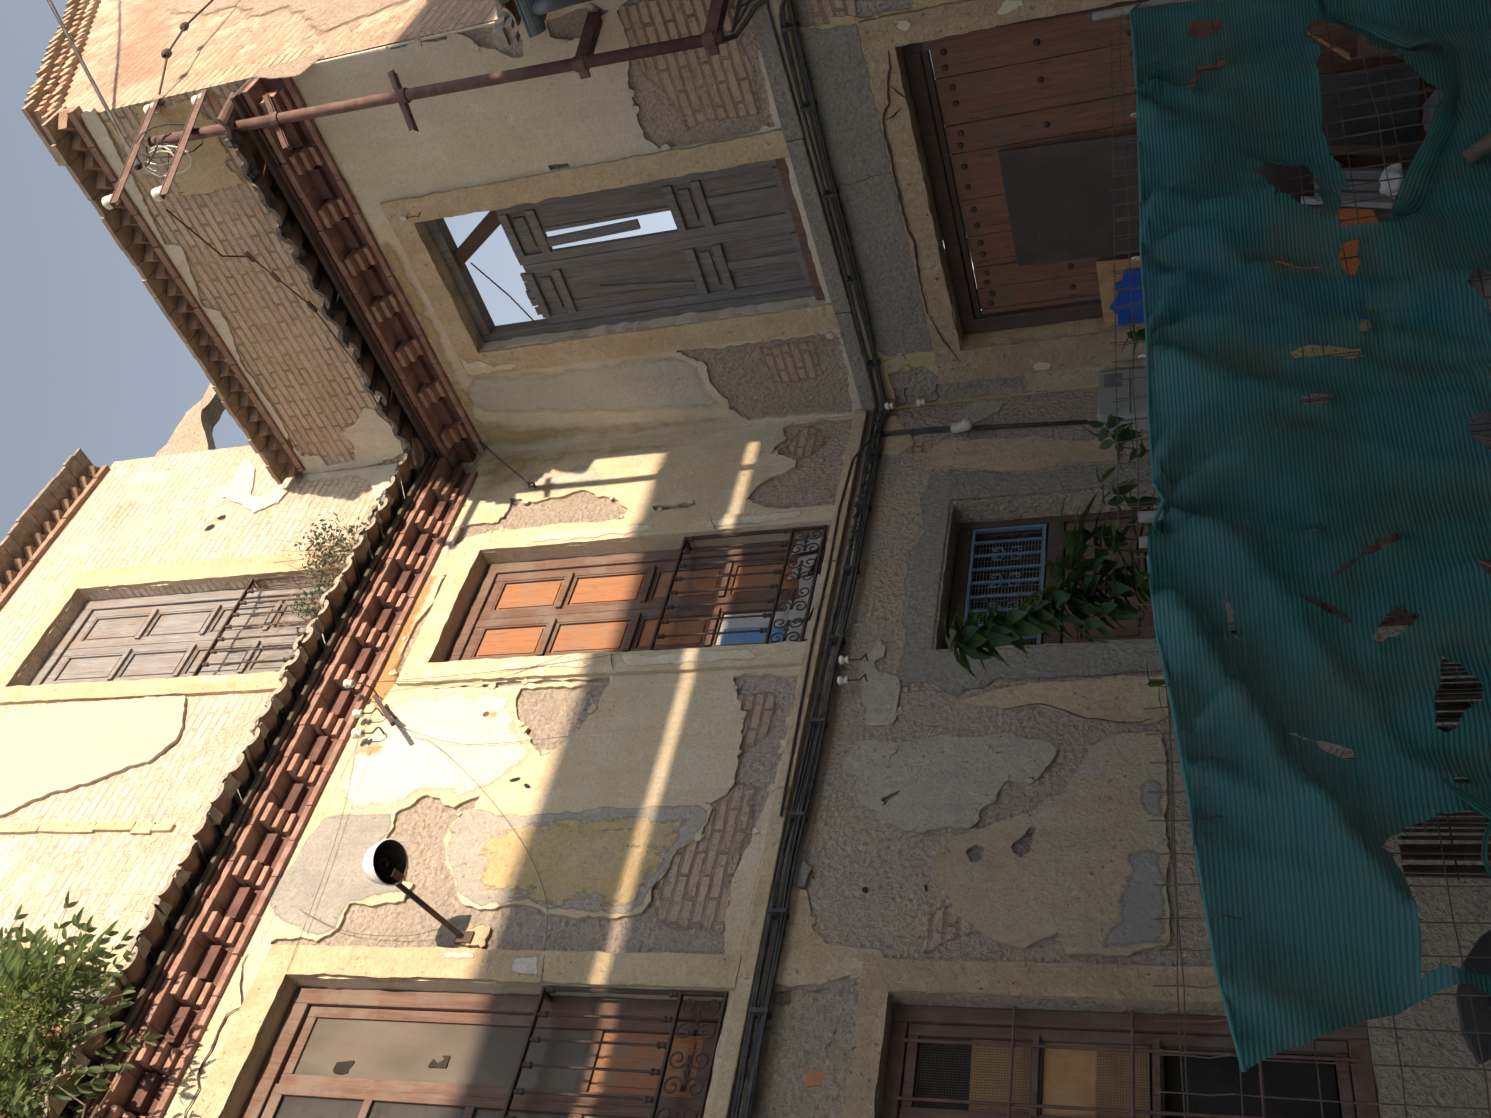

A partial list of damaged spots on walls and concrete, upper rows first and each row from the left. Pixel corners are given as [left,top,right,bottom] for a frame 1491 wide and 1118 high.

flaking render [385,27,524,57]
flaking render [548,0,775,151]
crack [843,50,960,361]
peeling [460,357,517,376]
flaking render [678,331,853,528]
flaking render [389,611,430,684]
flaking render [0,695,187,818]
flaking render [269,649,798,975]
flaking render [842,639,1173,959]
crack [184,954,248,1118]
flaking render [746,861,884,1118]